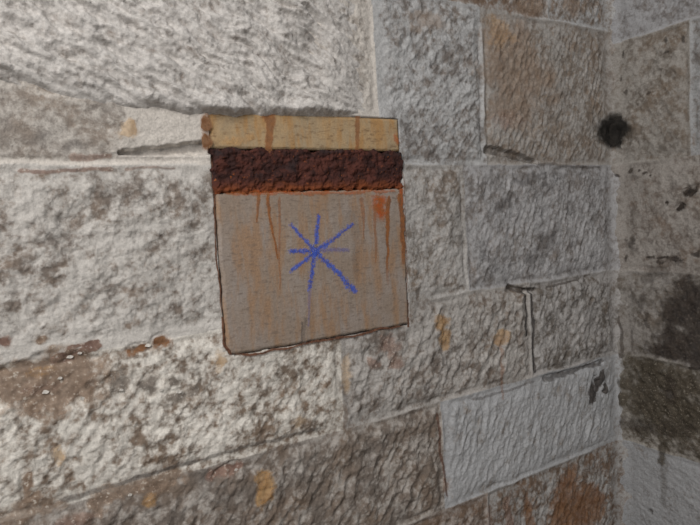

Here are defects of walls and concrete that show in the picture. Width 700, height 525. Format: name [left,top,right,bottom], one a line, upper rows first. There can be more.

crack [506,286,597,380]
leakage [617,347,700,465]